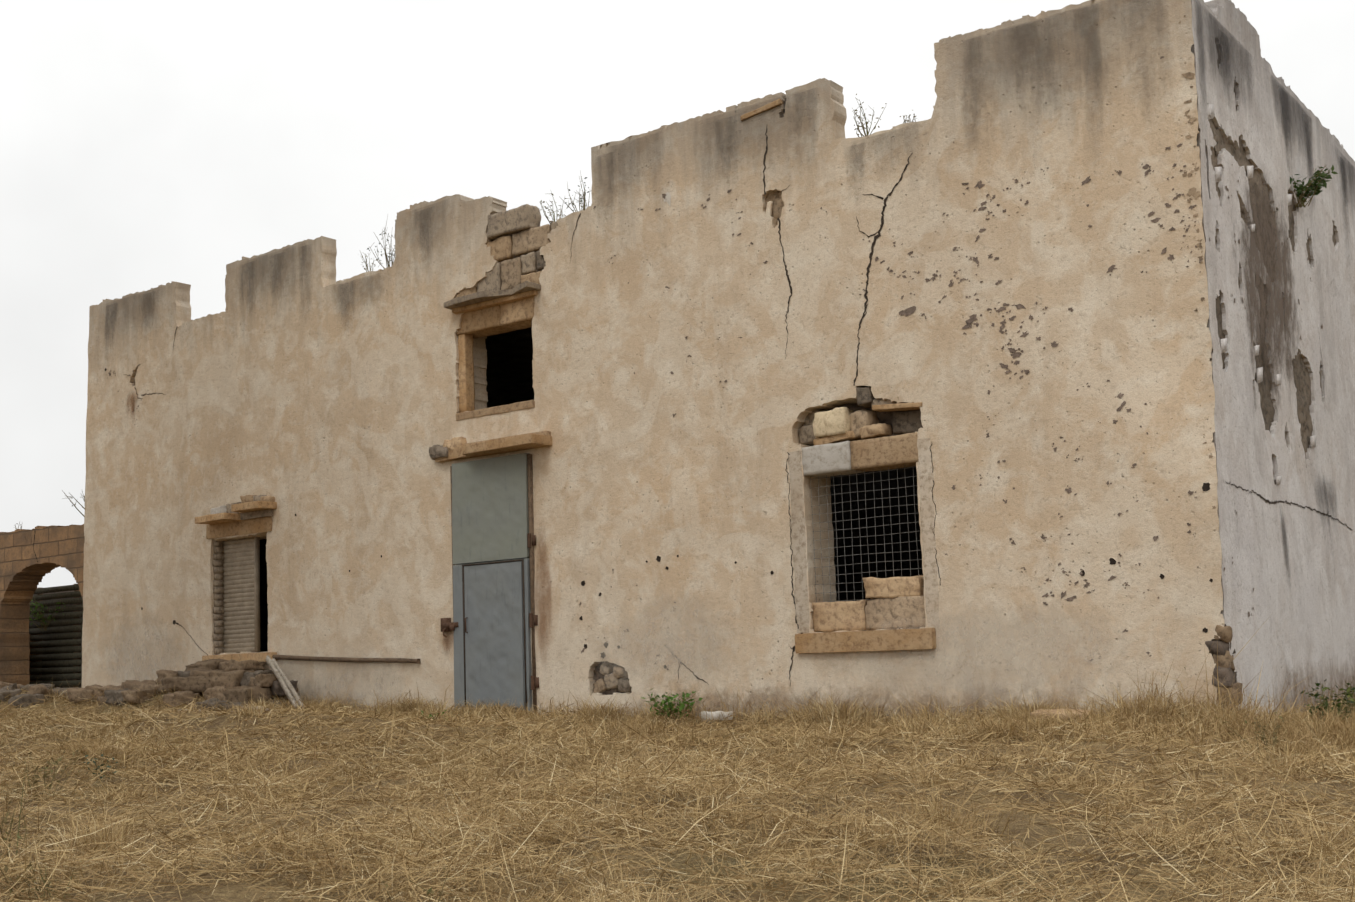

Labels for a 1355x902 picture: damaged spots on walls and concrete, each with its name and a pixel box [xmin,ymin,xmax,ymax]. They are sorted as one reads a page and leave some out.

leakage [1280,88,1313,176]
crack [763,127,792,358]
crack [853,153,912,386]
leakage [1243,184,1295,391]
flaking render [1188,481,1216,509]
crack [1227,482,1353,530]
hole [1042,557,1094,606]
hole [1104,554,1159,599]
flaking render [581,626,632,695]
flaking render [1202,625,1243,713]